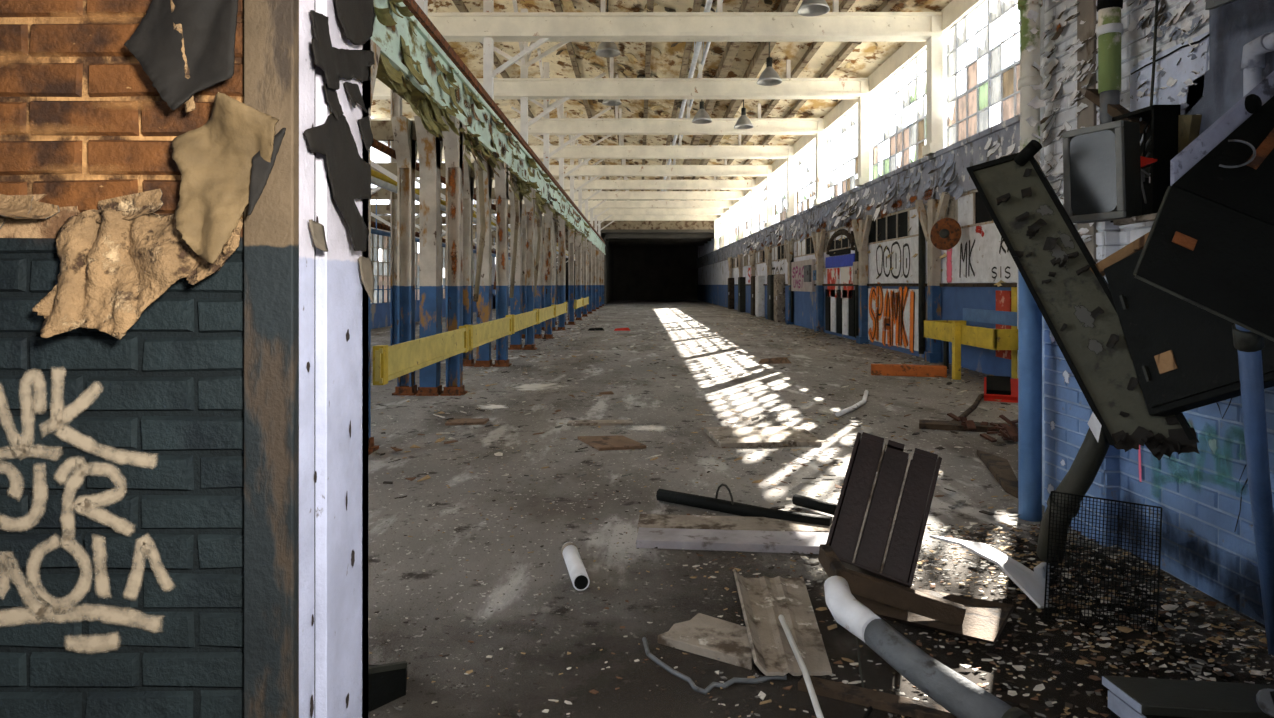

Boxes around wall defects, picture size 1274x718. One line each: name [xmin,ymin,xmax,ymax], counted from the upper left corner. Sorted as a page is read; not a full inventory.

peeling [0,0,286,339]
peeling [304,0,591,303]
rust [427,55,588,282]
peeling [577,99,698,118]
peeling [652,42,717,77]
peeling [743,219,800,274]
peeling [826,154,964,283]
peeling [1126,0,1209,115]